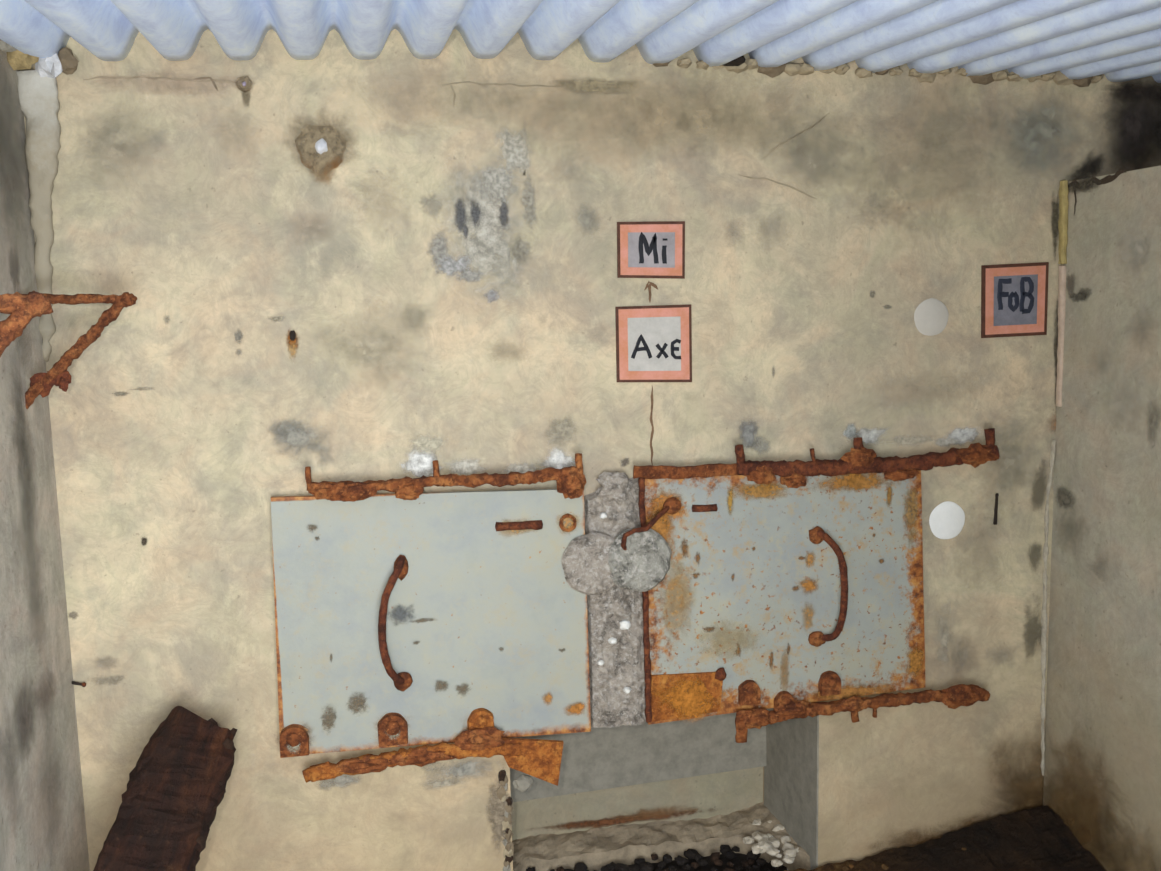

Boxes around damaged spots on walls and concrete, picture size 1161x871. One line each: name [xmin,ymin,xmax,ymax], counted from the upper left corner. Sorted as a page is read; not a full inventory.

damp [1116,82,1161,167]
spalling [294,122,351,179]
damp [1071,157,1102,180]
peeling [430,129,529,281]
corrosion [29,371,72,397]
corrosion [646,492,686,543]
corrosion [728,483,783,513]
corrosion [819,473,917,540]
corrosion [801,553,817,592]
peeling [608,620,631,644]
corrosion [566,703,585,714]
corrosion [658,678,715,719]